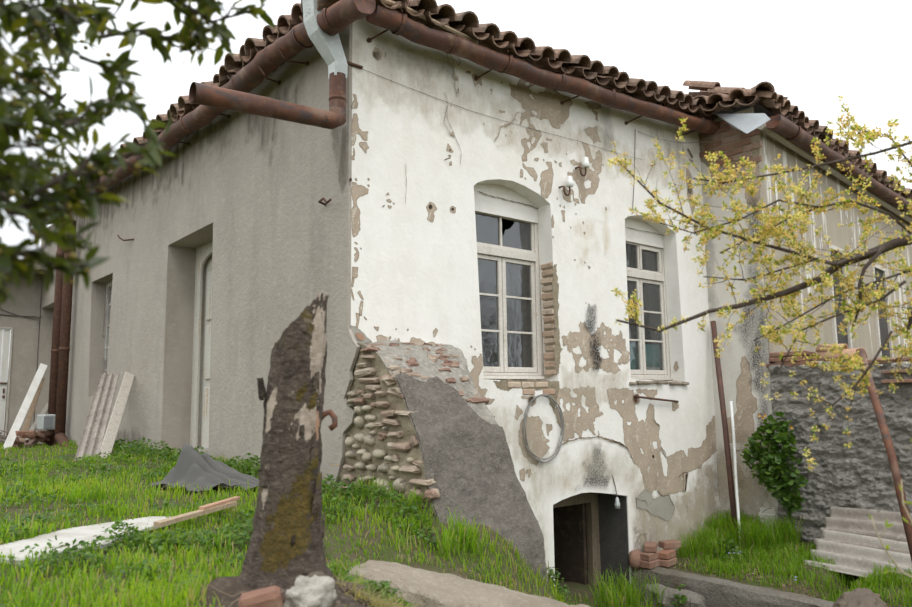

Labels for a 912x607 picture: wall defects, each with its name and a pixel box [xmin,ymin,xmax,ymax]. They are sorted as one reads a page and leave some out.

peeling [350,94,369,160]
peeling [501,79,604,238]
peeling [351,178,438,346]
peeling [470,262,717,496]
water stain [590,337,602,370]
peeling [727,356,758,443]